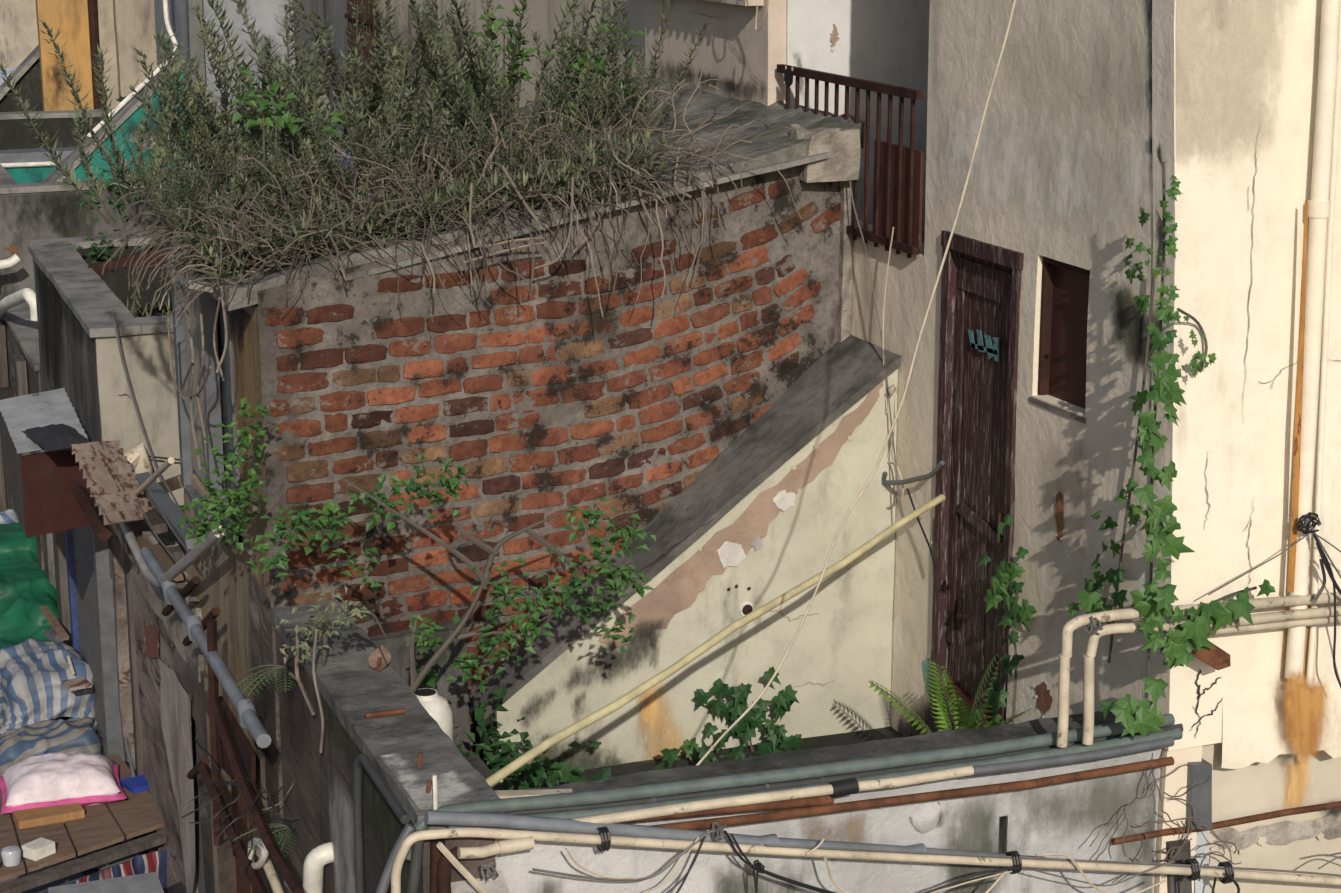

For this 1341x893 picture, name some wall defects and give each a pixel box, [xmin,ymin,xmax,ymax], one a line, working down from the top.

leakage [944,0,1273,268]
crack [1243,130,1340,423]
peeling [598,381,883,649]
crack [1192,669,1223,737]
leakage [725,873,760,893]